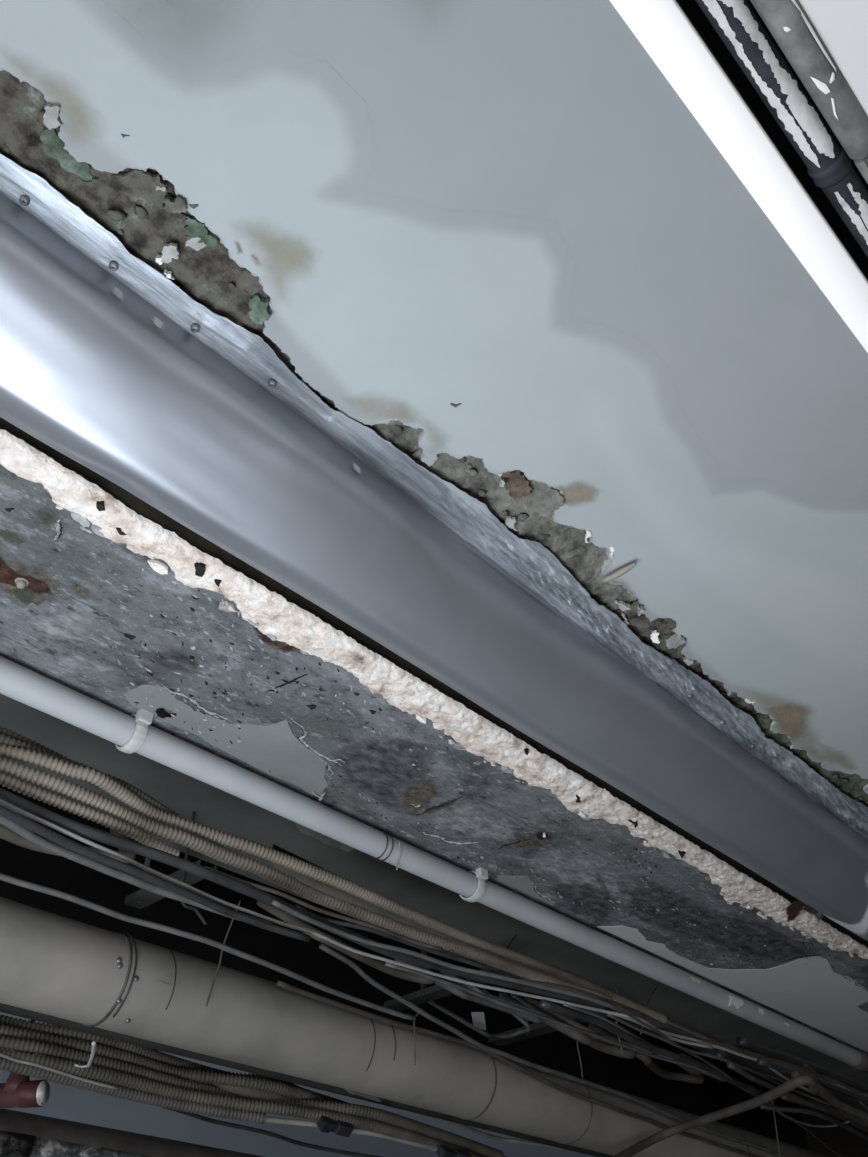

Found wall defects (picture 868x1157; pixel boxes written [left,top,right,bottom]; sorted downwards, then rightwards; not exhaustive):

peeling [702,0,838,168]
spalling [0,70,272,342]
peeling [834,183,868,245]
spalling [316,391,339,412]
leakage [558,485,592,503]
corrosion [0,559,55,605]
leakage [214,656,244,688]
spalling [0,420,868,1052]
leakage [765,700,814,753]